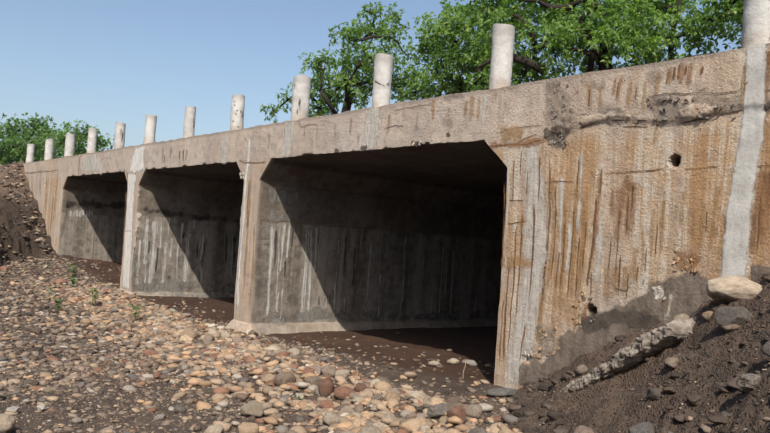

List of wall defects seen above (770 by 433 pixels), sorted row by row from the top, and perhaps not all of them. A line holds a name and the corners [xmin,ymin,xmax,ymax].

spalling [544,83,573,148]
rust [613,77,645,108]
spalling [646,96,710,121]
rust [655,64,704,93]
water stain [55,135,250,306]
water stain [265,188,309,325]
water stain [296,227,462,322]
rust [491,126,545,360]
rust [537,157,602,334]
water stain [507,146,712,386]
rust [605,176,665,296]
rust [751,172,770,250]